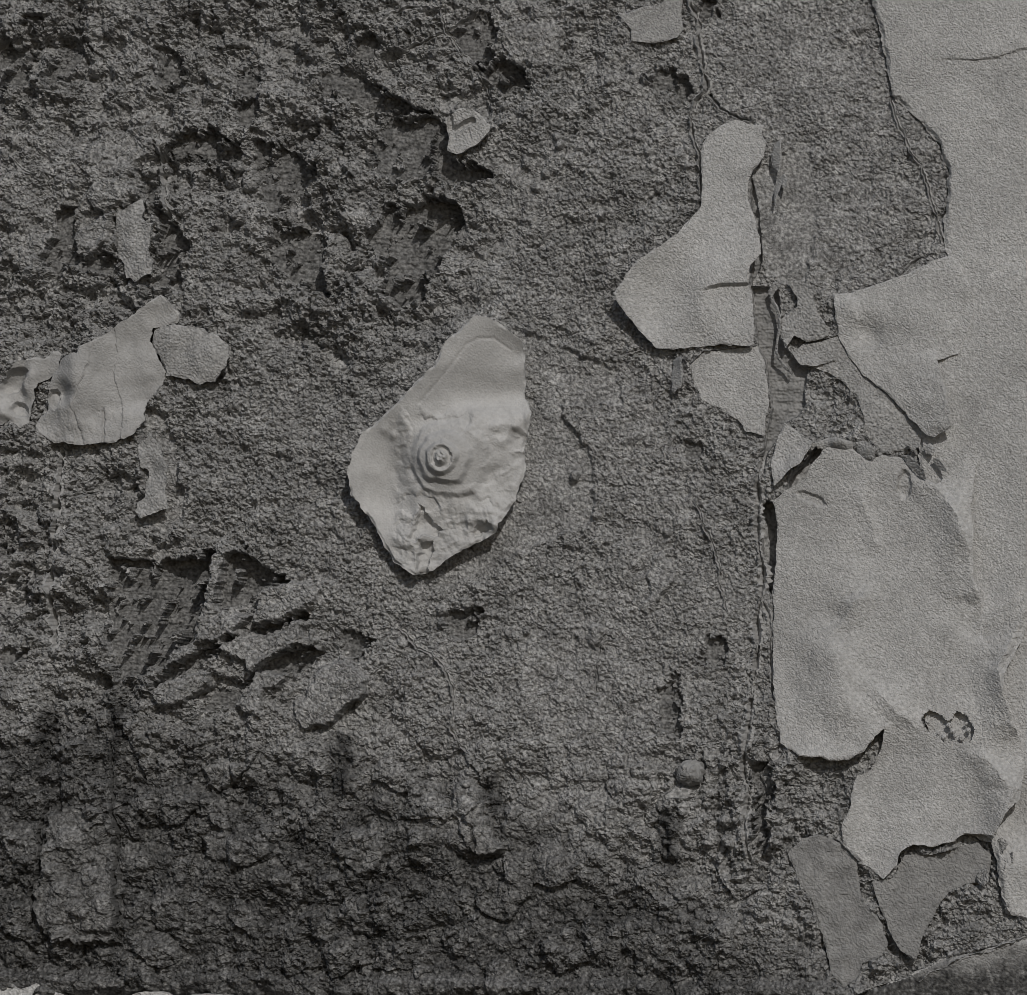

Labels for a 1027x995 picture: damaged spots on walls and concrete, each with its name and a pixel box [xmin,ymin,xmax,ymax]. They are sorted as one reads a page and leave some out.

peeling [618,0,683,44]
spalling [648,68,693,100]
crack [948,48,1027,63]
peeling [0,171,230,518]
peeling [614,120,975,486]
spalling [657,674,684,738]
spalling [698,635,729,668]
crack [730,457,774,864]
spalling [752,762,776,856]
peeling [788,834,1013,987]